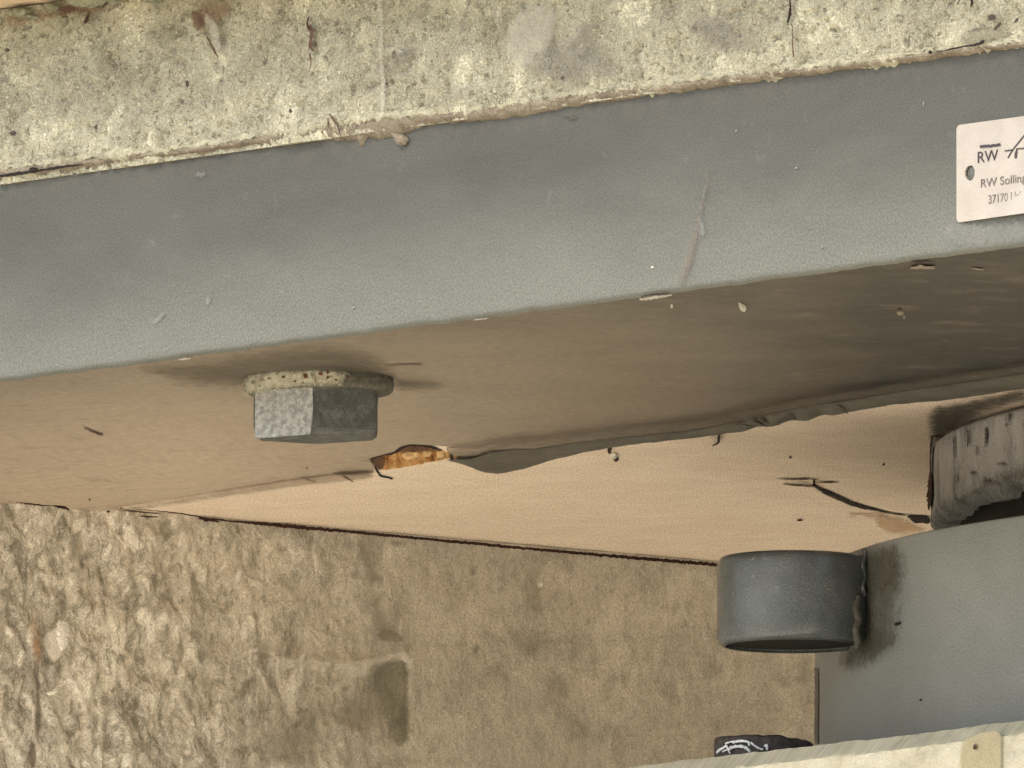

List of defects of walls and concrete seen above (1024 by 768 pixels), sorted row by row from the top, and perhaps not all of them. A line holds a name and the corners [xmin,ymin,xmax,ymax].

spalling [369,444,458,480]
crack [777,436,933,533]